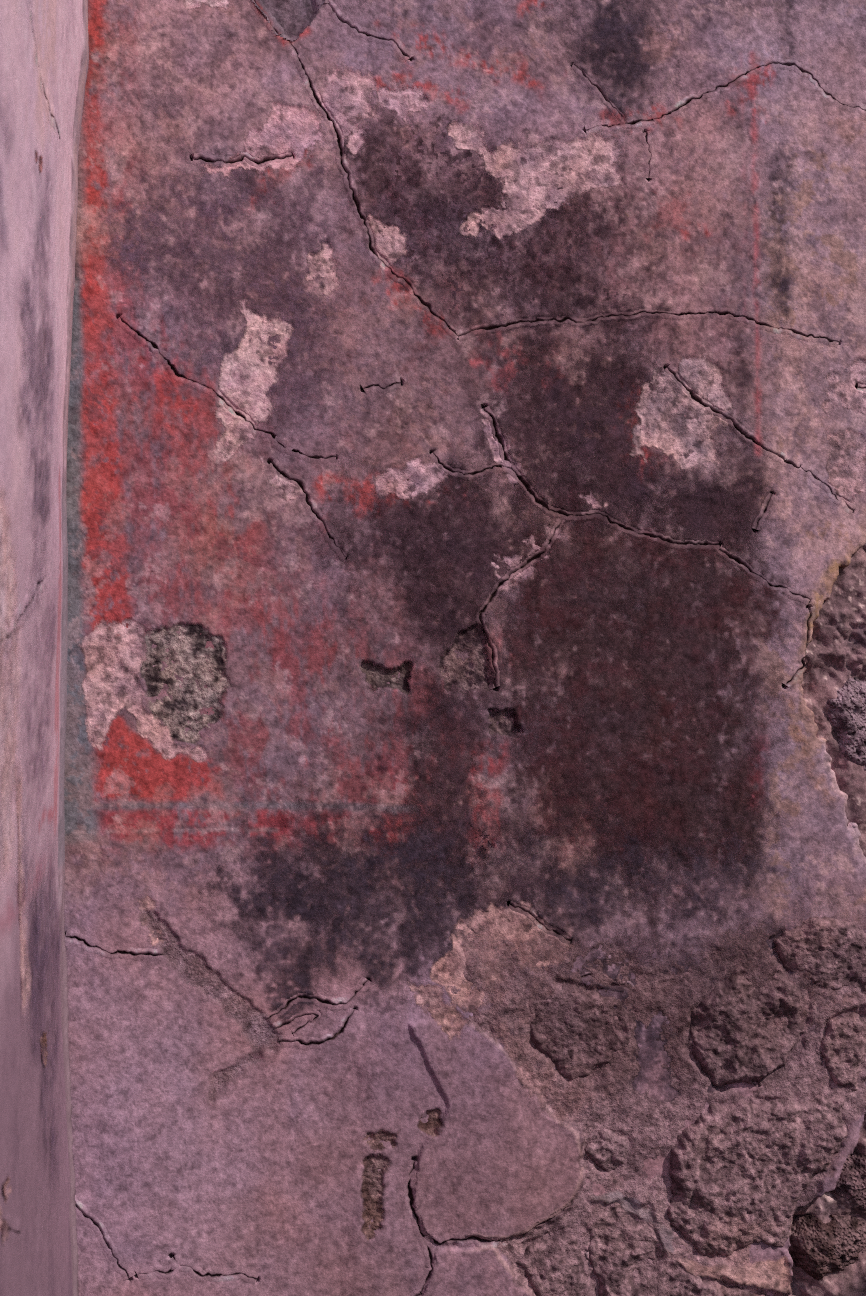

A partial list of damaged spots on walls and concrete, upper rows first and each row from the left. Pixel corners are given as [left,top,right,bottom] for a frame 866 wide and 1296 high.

damp [21,283,53,430]
damp [110,170,331,393]
crack [115,313,350,562]
peeling [215,300,294,463]
damp [217,117,781,1018]
peeling [448,121,622,239]
crack [283,40,866,348]
crack [428,364,856,689]
spalling [81,619,229,762]
damp [585,955,676,1062]
spalling [408,901,866,1296]
crack [402,1159,572,1296]